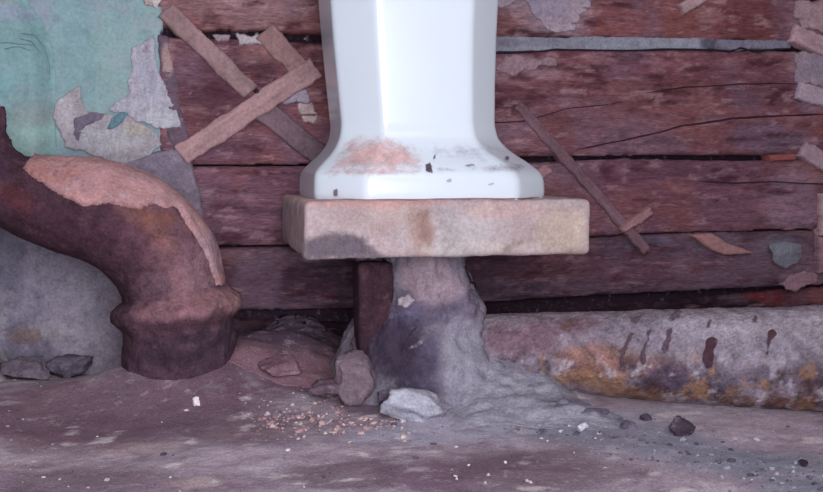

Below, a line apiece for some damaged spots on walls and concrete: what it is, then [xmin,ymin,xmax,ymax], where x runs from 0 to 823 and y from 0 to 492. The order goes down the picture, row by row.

peeling [525,0,591,32]
peeling [793,0,823,32]
peeling [794,51,823,86]
crack [647,83,813,93]
spalling [53,34,204,218]
crack [495,101,622,123]
crack [577,114,823,150]
corrosion [339,141,415,169]
spalling [0,227,123,374]